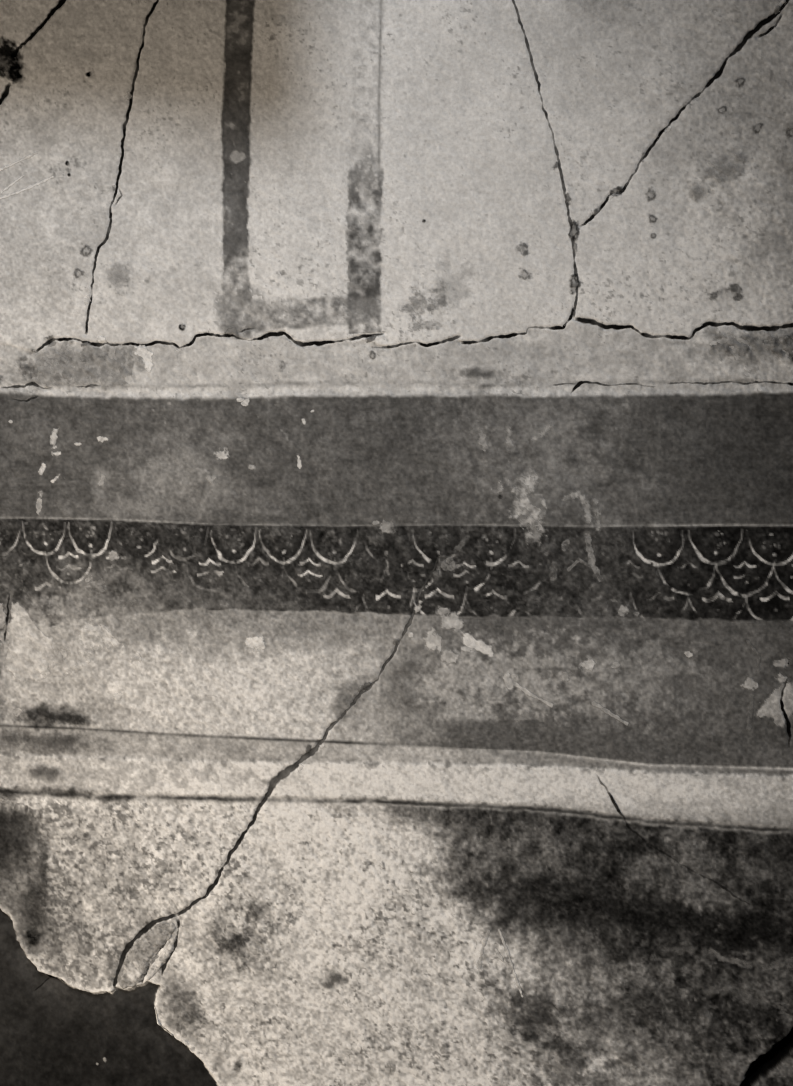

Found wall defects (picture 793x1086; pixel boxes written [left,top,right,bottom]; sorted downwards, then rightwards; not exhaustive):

crack [14,0,66,55]
crack [0,84,10,105]
crack [37,0,793,353]
crack [4,382,39,402]
crack [556,381,632,391]
crack [696,379,793,387]
crack [780,661,791,744]
crack [113,573,432,988]
spalling [0,905,222,1086]
crack [741,1028,793,1086]